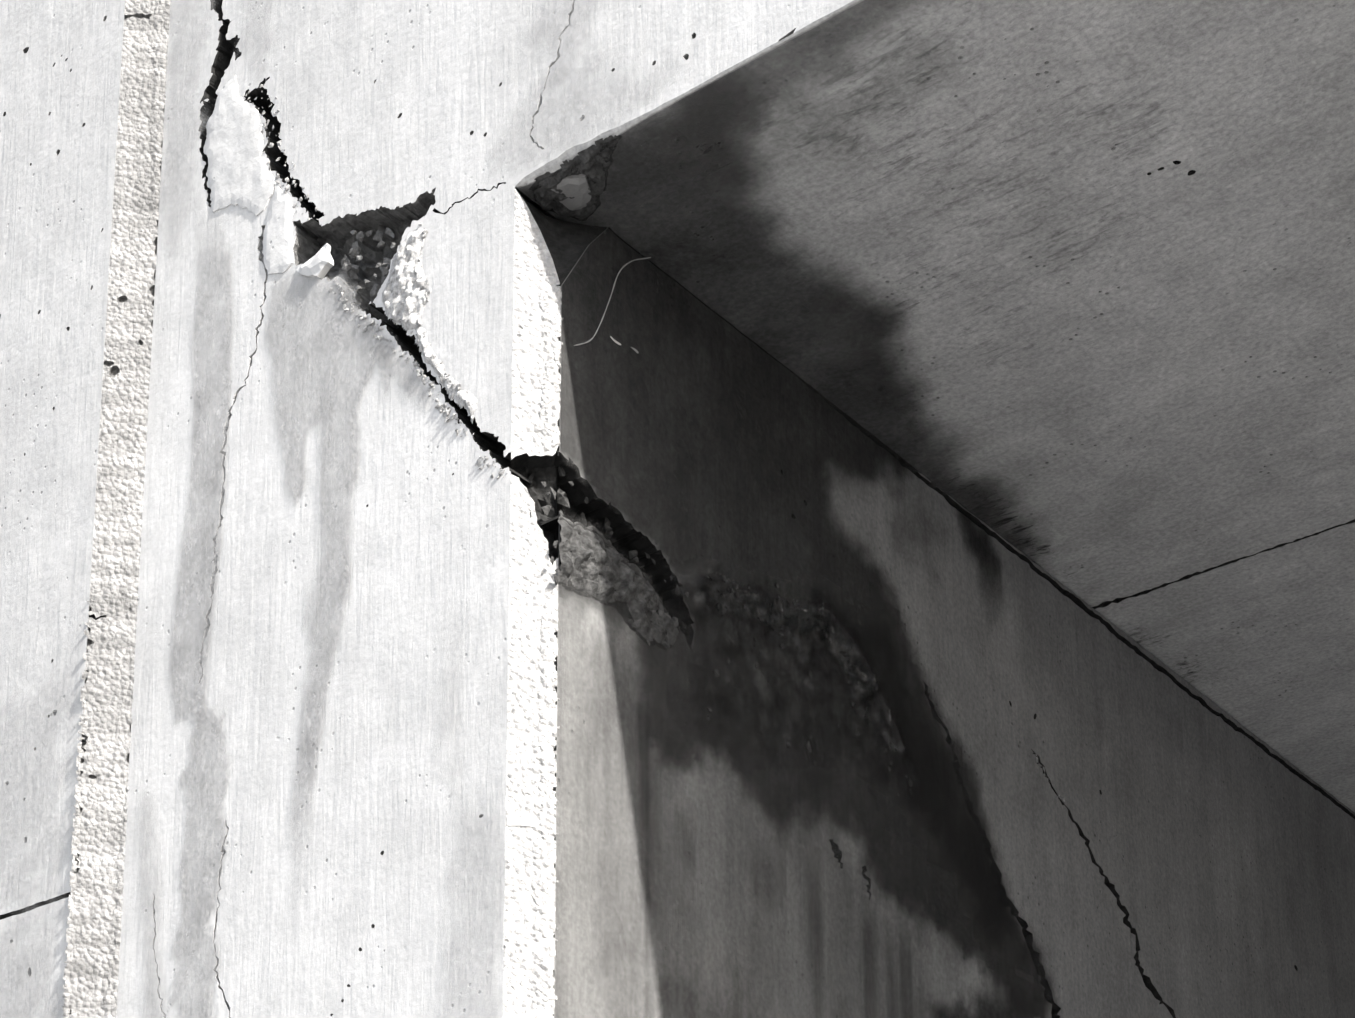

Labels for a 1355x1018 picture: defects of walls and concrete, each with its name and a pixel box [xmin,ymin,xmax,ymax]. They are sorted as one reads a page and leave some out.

damp [299,278,381,399]
crack [198,0,694,682]
damp [180,528,223,751]
damp [521,80,1051,1018]
crack [922,680,951,741]
crack [988,840,1061,1018]
crack [1031,749,1176,1018]